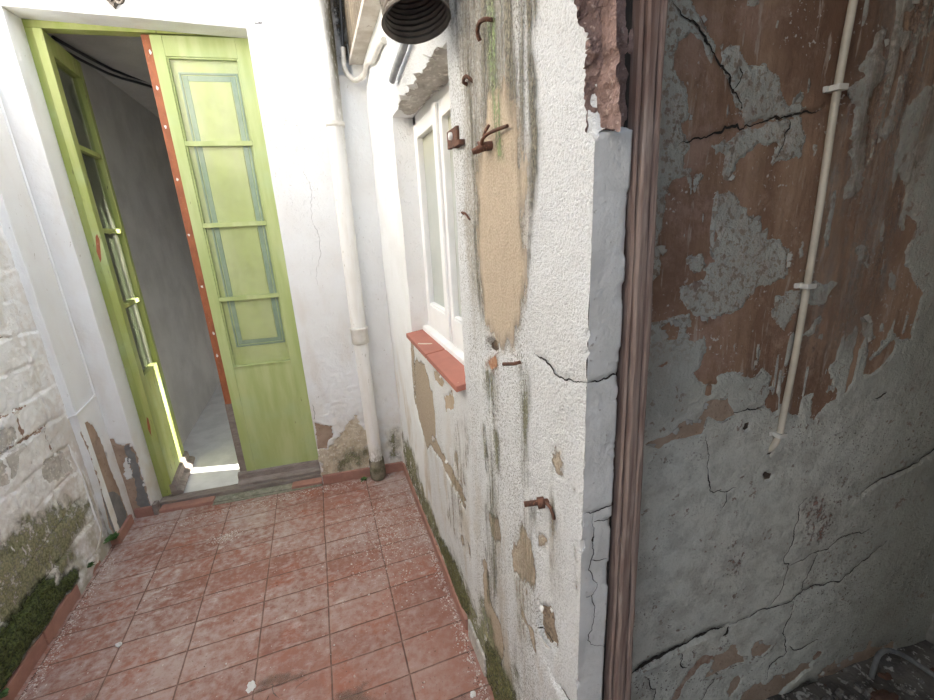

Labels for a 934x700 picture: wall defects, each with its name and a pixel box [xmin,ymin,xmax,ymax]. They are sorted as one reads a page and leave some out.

damp [455,0,537,208]
flaking render [574,0,633,133]
crack [672,1,825,157]
damp [474,190,484,315]
peeling [645,0,934,449]
peeling [80,422,150,533]
peeling [411,343,466,508]
damp [448,445,468,532]
damp [483,413,499,604]
crack [535,354,616,383]
crack [861,449,934,494]
crack [632,502,884,700]